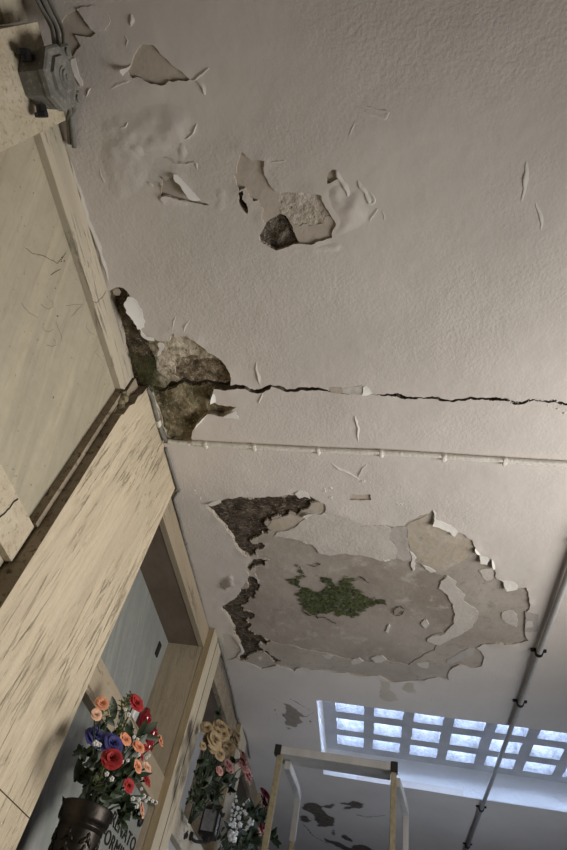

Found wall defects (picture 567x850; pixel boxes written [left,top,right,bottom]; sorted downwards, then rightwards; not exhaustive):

peeling [110,44,209,95]
peeling [147,157,206,207]
spalling [234,152,342,252]
spalling [111,287,239,442]
crack [155,378,231,390]
crack [330,386,372,396]
peeling [193,489,539,701]